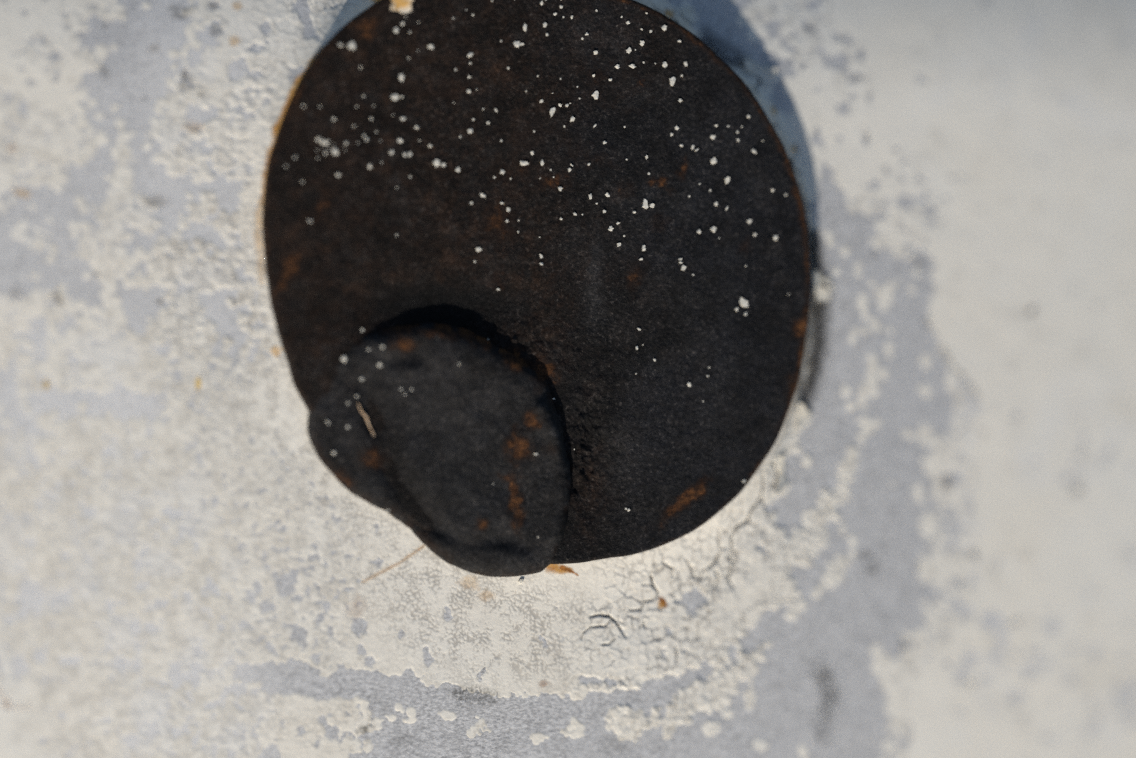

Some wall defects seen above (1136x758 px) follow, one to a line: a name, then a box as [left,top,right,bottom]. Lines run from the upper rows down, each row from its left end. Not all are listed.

peeling [0,0,273,346]
peeling [289,64,306,82]
peeling [293,0,321,40]
peeling [316,95,412,169]
peeling [391,74,460,172]
peeling [539,86,599,127]
peeling [608,0,874,115]
peeling [193,125,981,758]
rust [547,564,578,576]
crack [582,463,779,645]